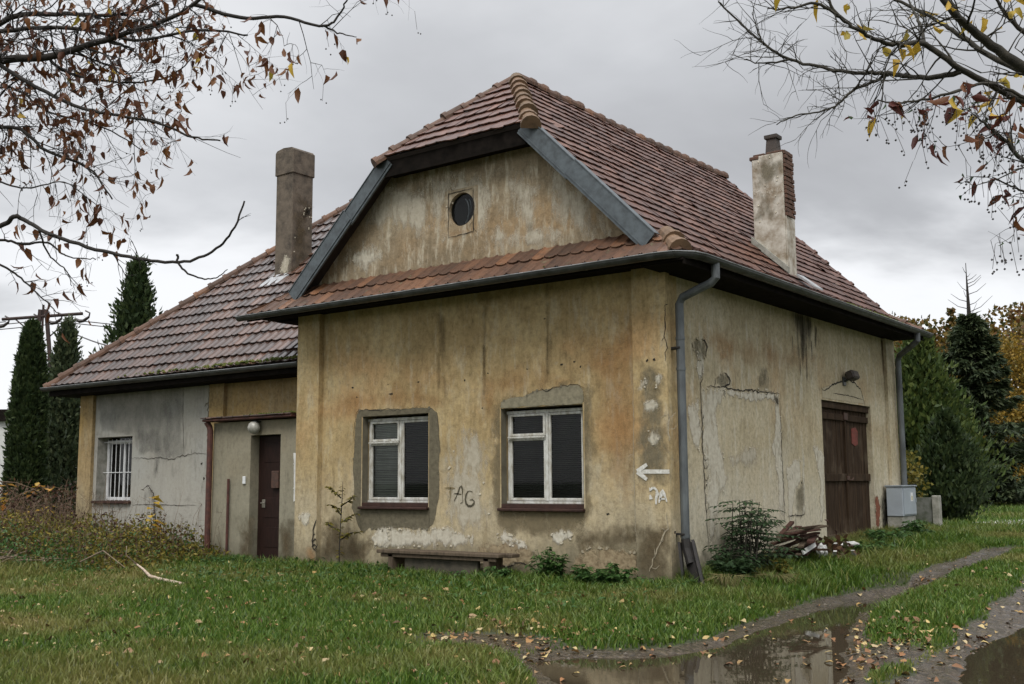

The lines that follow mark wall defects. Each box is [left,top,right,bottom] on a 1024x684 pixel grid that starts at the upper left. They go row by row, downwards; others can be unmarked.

leakage [795,313,817,367]
peeling [371,436,534,568]
peeling [551,530,573,544]
peeling [640,373,801,538]